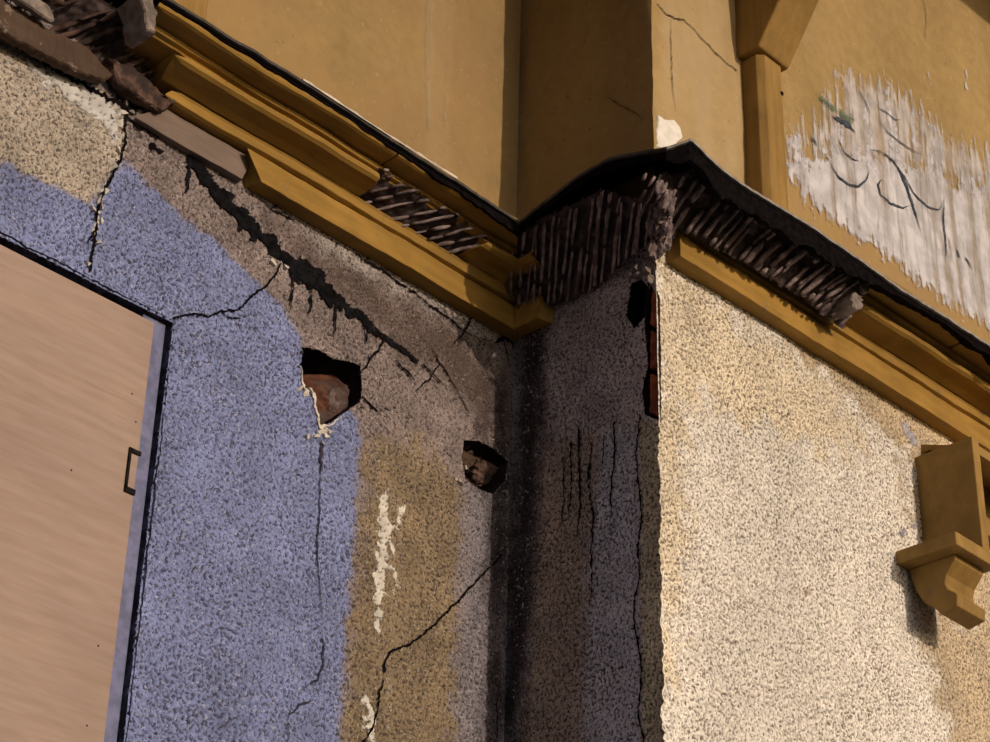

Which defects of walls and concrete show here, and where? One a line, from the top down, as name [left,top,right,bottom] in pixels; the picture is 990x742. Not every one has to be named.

peeling [23,56,122,145]
crack [16,47,164,272]
crack [658,4,737,109]
crack [287,444,325,742]
spalling [297,347,366,446]
crack [173,155,514,416]
crack [362,554,503,742]
spalling [454,439,511,495]
leakage [487,329,547,742]
spalling [624,263,665,421]